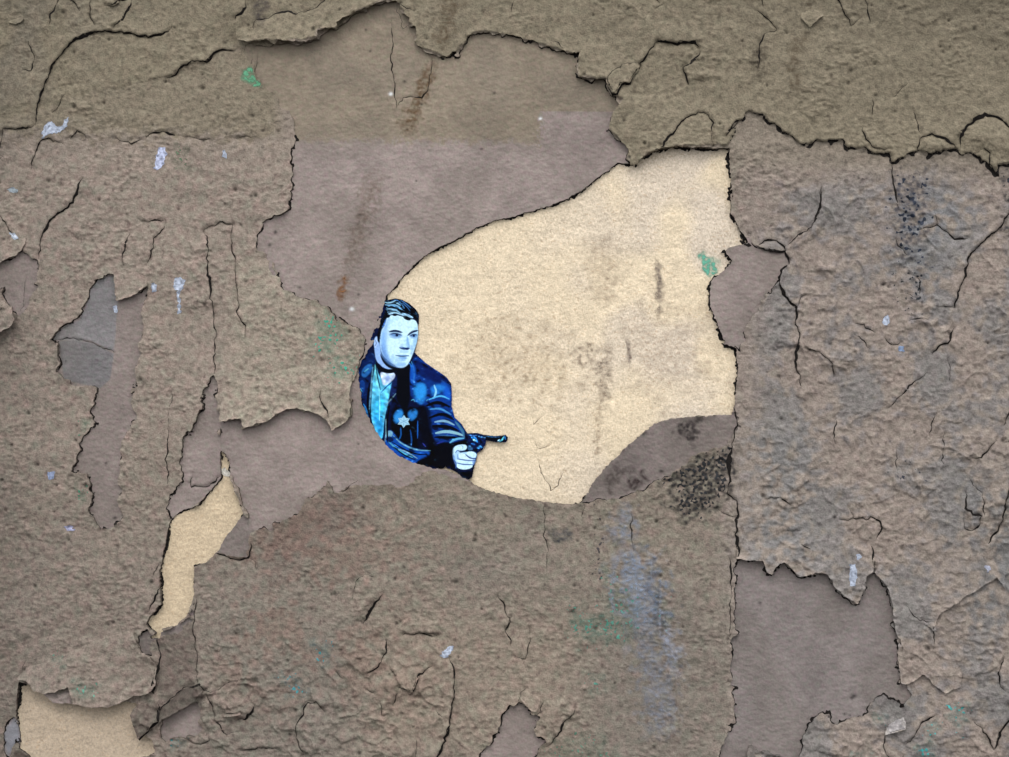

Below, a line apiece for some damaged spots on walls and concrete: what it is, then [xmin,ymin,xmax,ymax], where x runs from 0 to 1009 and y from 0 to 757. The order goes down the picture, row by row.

crack [38,179,82,254]
crack [0,0,171,169]
crack [168,49,258,78]
crack [203,221,246,369]
peeling [0,0,751,757]
crack [752,189,834,386]
crack [662,86,1009,208]
crack [896,211,1009,380]
crack [718,408,740,639]
crack [132,599,325,754]
crack [368,633,455,757]
peeling [719,538,1007,757]